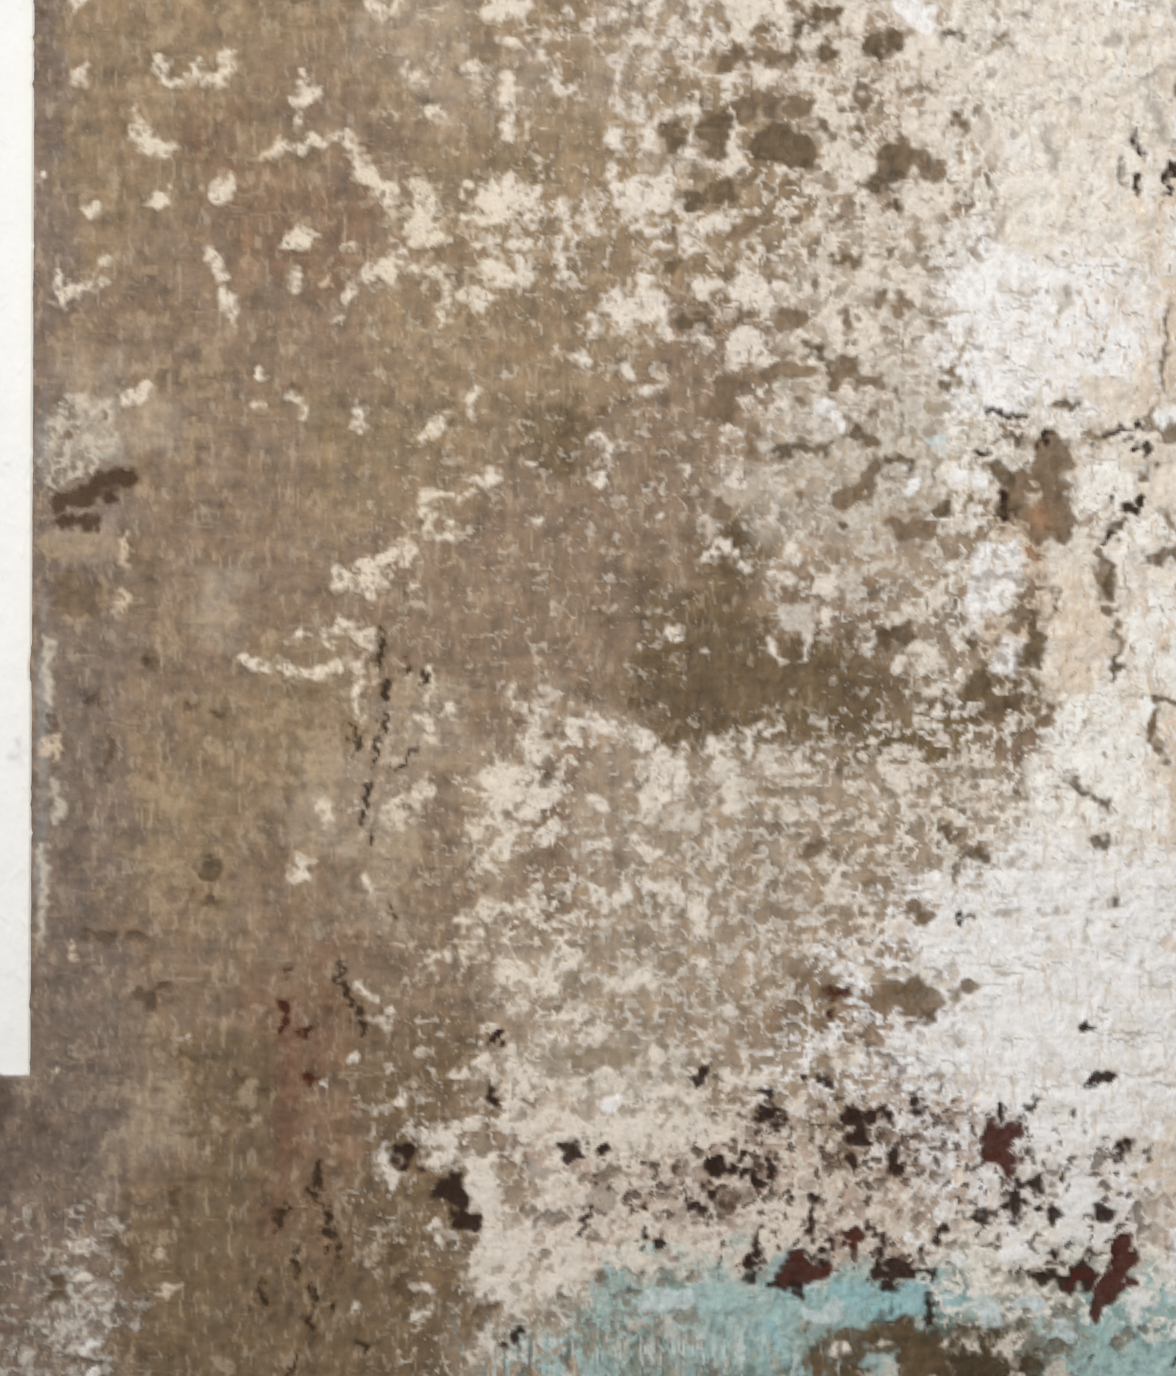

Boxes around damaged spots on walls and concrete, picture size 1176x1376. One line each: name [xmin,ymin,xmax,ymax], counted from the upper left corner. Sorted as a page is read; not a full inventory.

peeling [33,0,137,99]
peeling [34,106,73,149]
peeling [222,358,334,453]
peeling [523,502,551,532]
peeling [527,555,623,620]
peeling [588,570,699,722]
peeling [4,514,325,964]
peeling [376,627,486,767]
peeling [343,1048,362,1066]
corrosion [821,983,860,1022]
corrosion [925,1006,939,1027]
corrosion [609,1033,1161,1358]